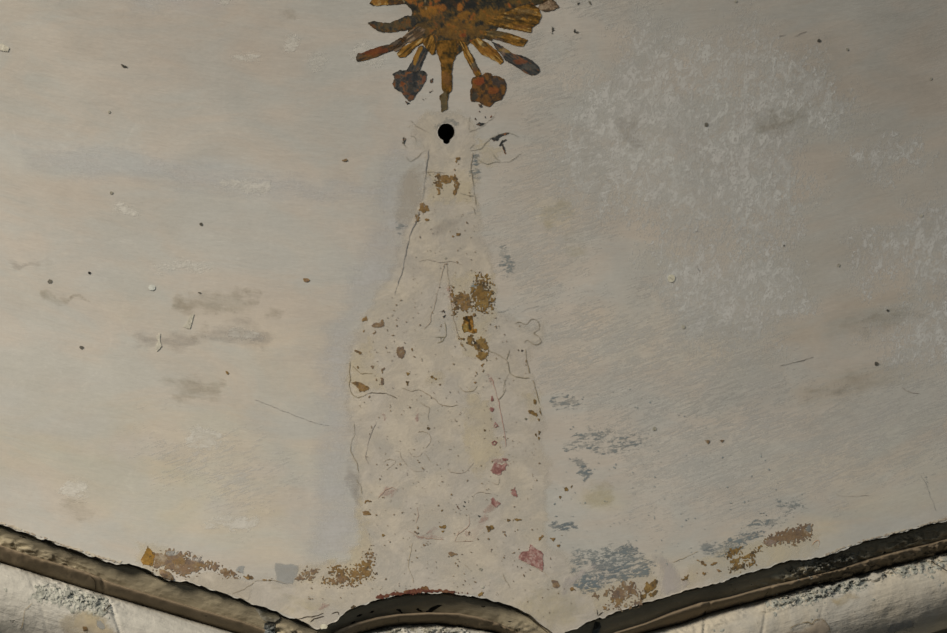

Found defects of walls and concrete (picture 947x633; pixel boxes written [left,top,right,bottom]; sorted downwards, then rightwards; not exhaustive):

peeling [141,104,658,633]
crack [349,349,542,443]
peeling [681,523,813,581]
peeling [764,517,947,610]